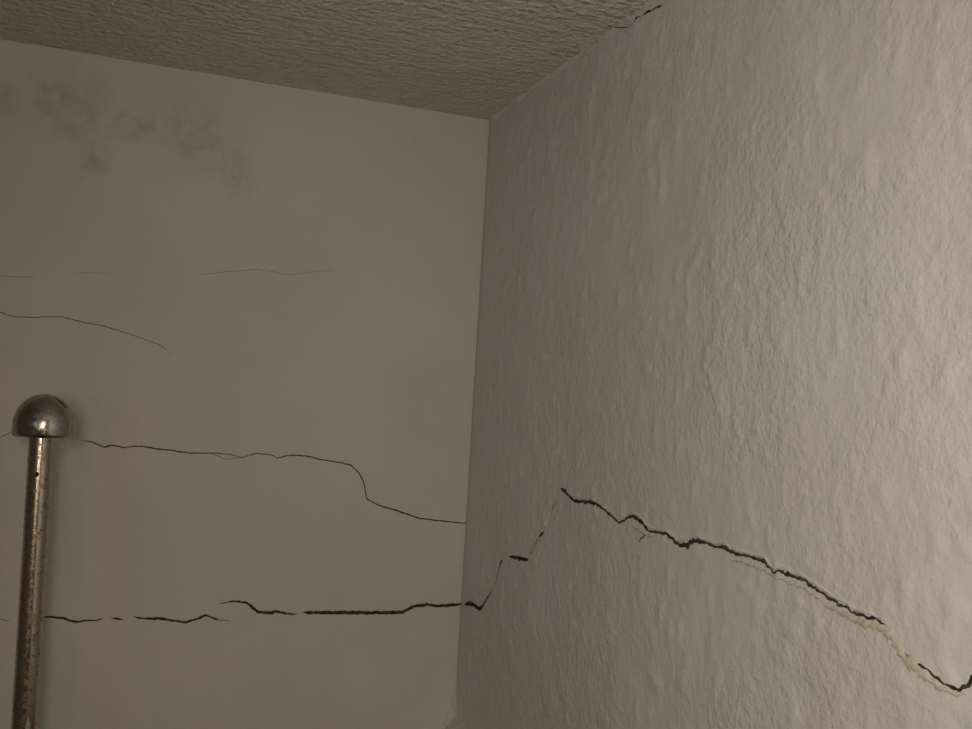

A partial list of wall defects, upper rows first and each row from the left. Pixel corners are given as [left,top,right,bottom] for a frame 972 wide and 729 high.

crack [0,312,172,354]
crack [83,440,465,524]
crack [43,488,972,697]